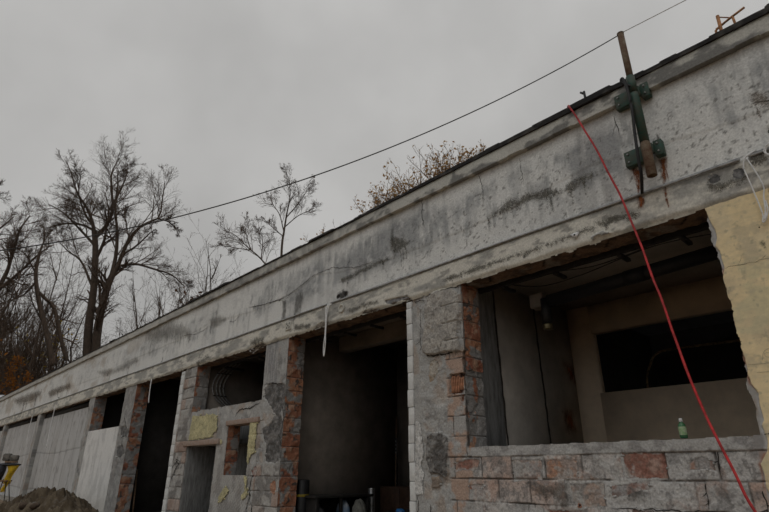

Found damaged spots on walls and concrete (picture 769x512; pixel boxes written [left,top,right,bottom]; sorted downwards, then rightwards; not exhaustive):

corrosion [660,158,669,207]
flaking render [449,373,466,407]
spalling [247,383,285,464]
spalling [415,421,480,495]
crack [618,452,721,512]